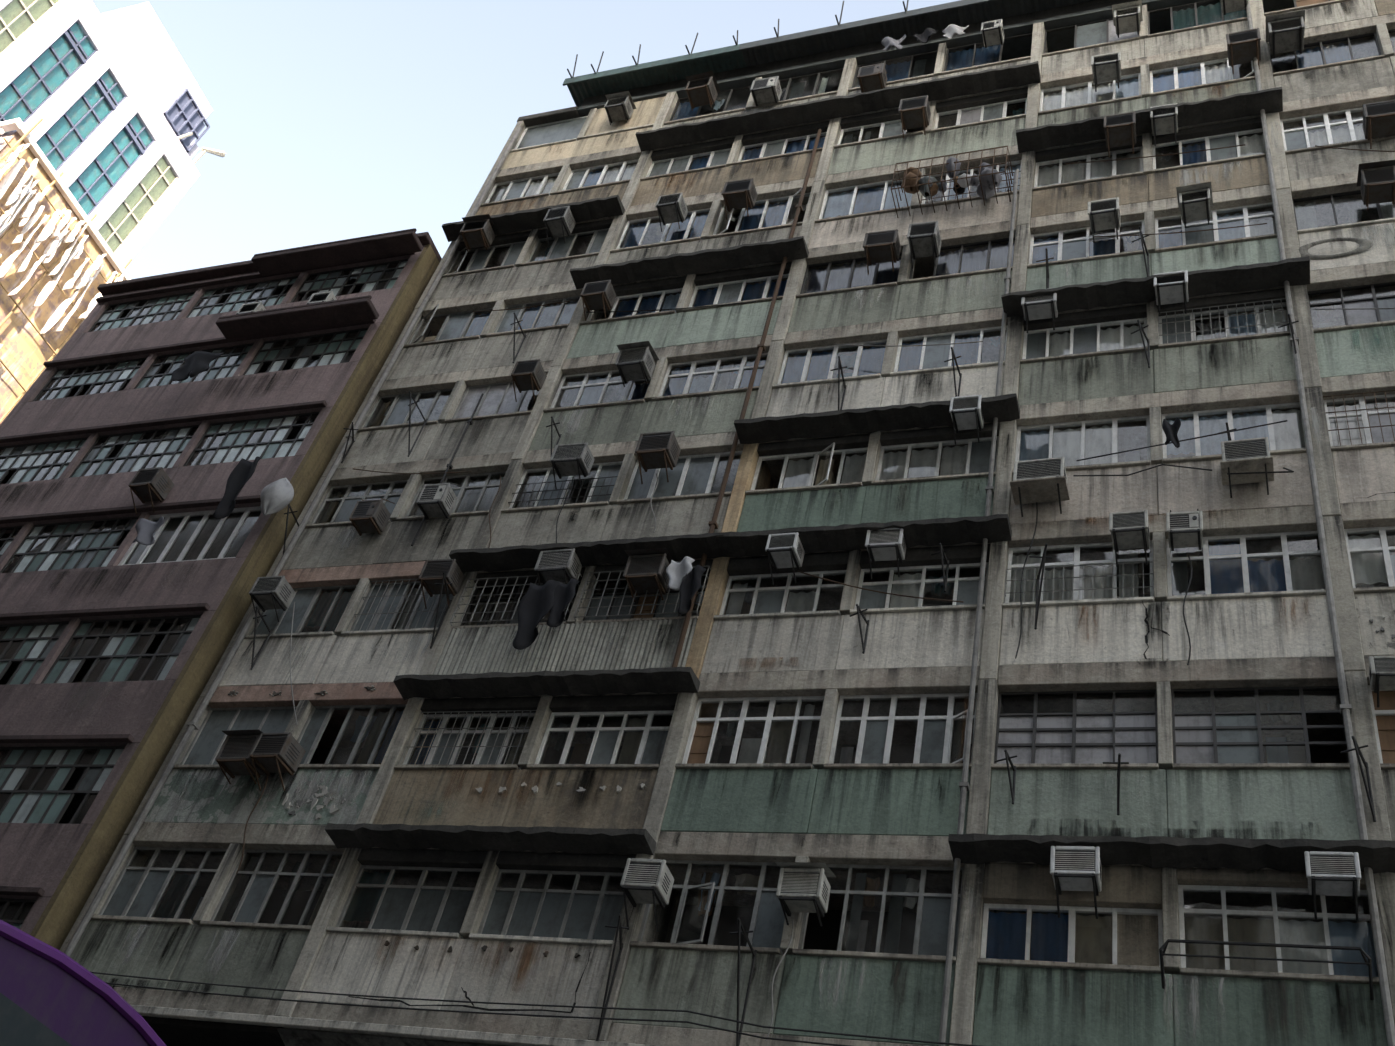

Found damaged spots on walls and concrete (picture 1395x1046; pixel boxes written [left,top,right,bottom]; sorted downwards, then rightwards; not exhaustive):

leakage [1147,604,1161,634]